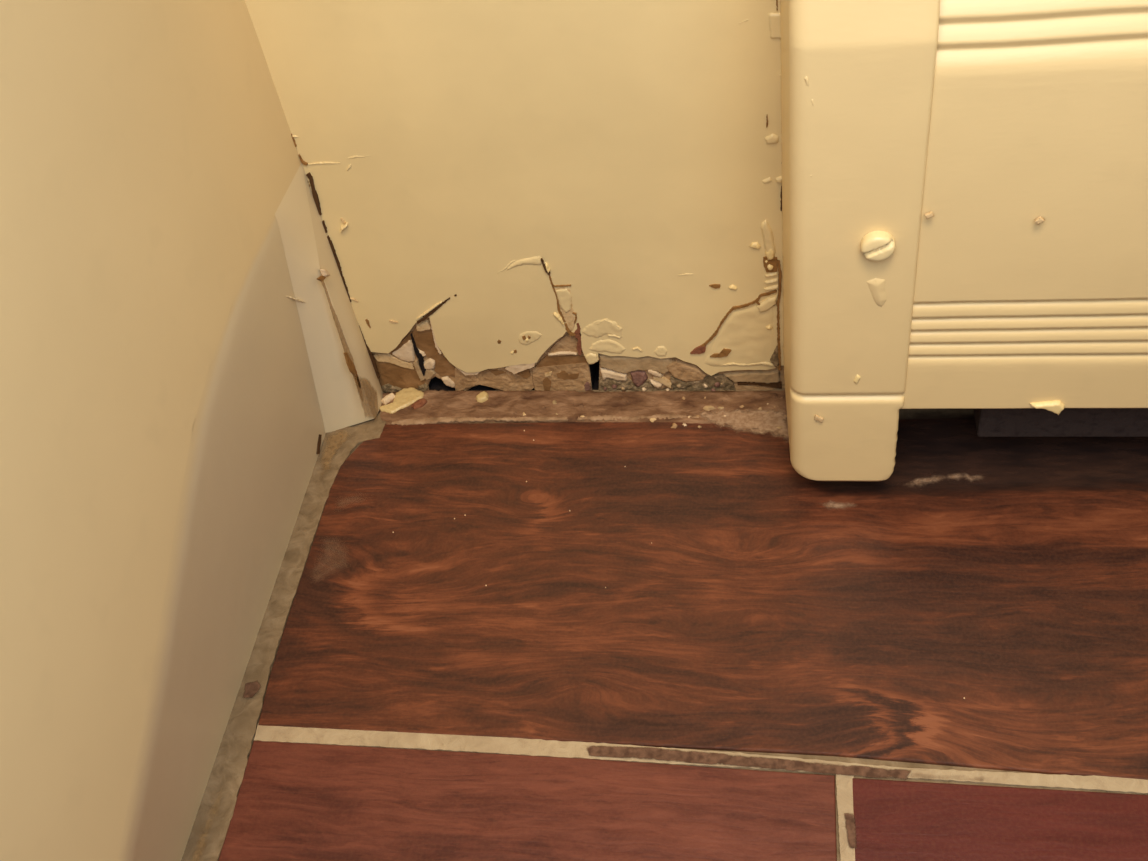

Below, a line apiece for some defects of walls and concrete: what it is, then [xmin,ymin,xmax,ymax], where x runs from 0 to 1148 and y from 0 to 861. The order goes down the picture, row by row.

peeling [497,256,551,275]
spalling [317,269,782,419]